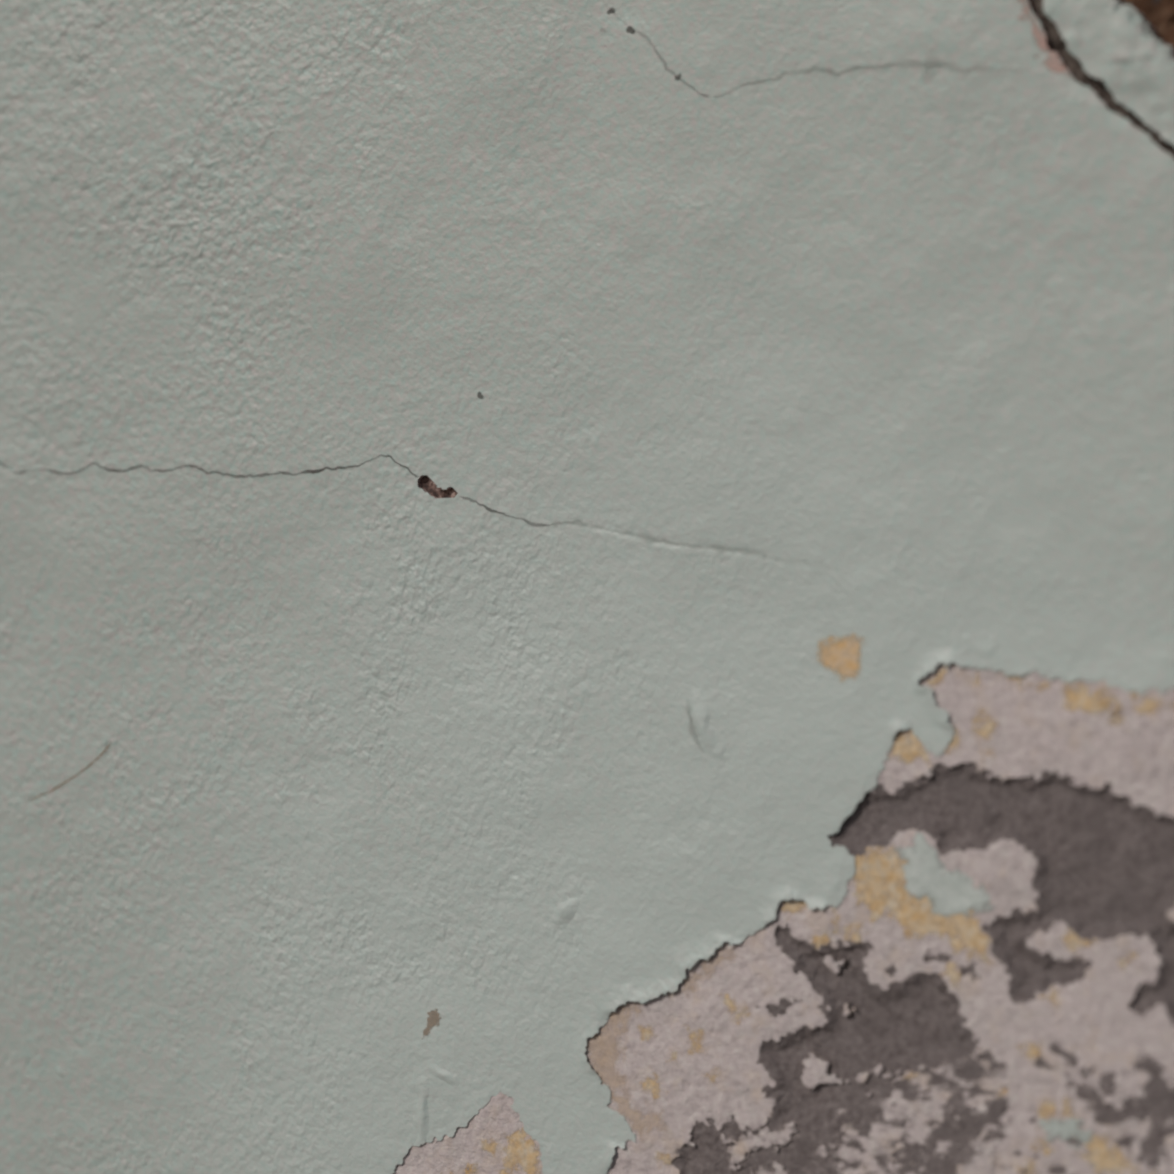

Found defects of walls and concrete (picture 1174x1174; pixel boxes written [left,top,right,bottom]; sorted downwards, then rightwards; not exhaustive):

crack [1019,0,1174,157]
spalling [1043,0,1174,145]
crack [105,465,167,473]
crack [306,466,327,474]
crack [390,456,458,498]
peeling [817,635,861,679]
peeling [585,663,1174,1174]
peeling [424,1011,439,1034]
peeling [393,1092,543,1174]